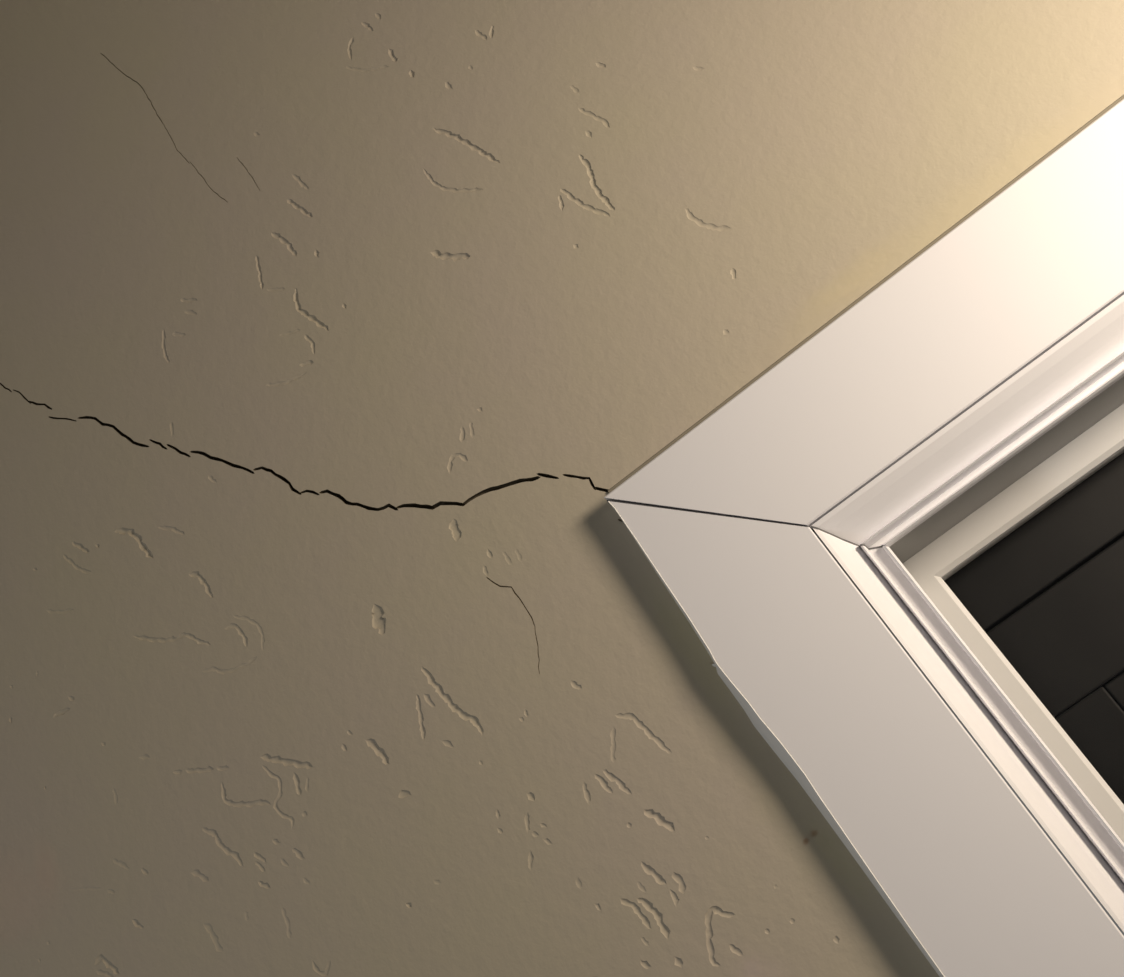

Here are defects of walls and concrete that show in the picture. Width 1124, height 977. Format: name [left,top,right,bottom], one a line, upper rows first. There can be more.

crack [0,383,883,550]